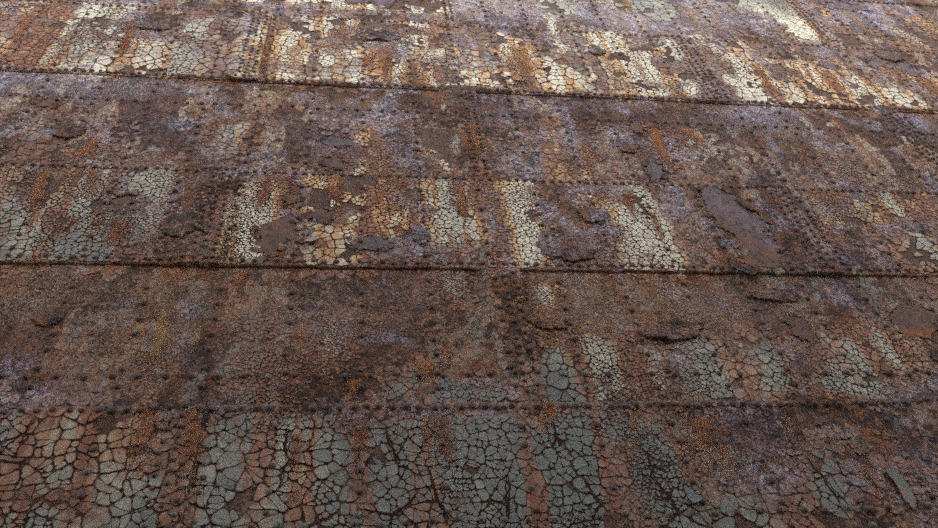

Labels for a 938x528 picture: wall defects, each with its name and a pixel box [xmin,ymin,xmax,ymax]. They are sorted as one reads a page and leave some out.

peeling [0,94,793,312]
peeling [766,129,938,301]
peeling [0,272,938,528]
crack [1,418,36,477]
crack [281,435,301,484]
crack [386,428,408,468]
crack [373,478,450,528]
crack [484,474,511,518]
crack [581,481,611,514]
crack [638,445,680,528]
crack [805,453,841,503]